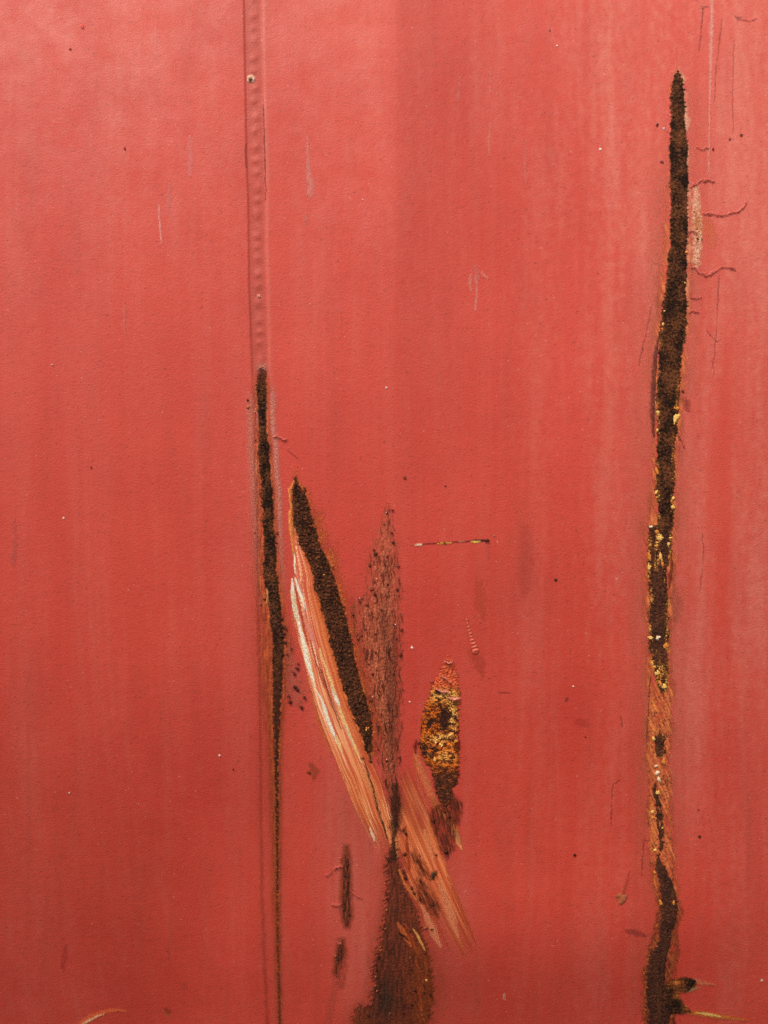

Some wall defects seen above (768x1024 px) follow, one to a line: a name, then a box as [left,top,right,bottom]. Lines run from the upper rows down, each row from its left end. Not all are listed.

corrosion [246,365,306,1024]
spalling [288,476,375,763]
corrosion [334,939,344,976]
corrosion [326,846,361,926]
corrosion [350,508,438,1024]
corrosion [413,655,462,857]
corrosion [643,71,745,1024]